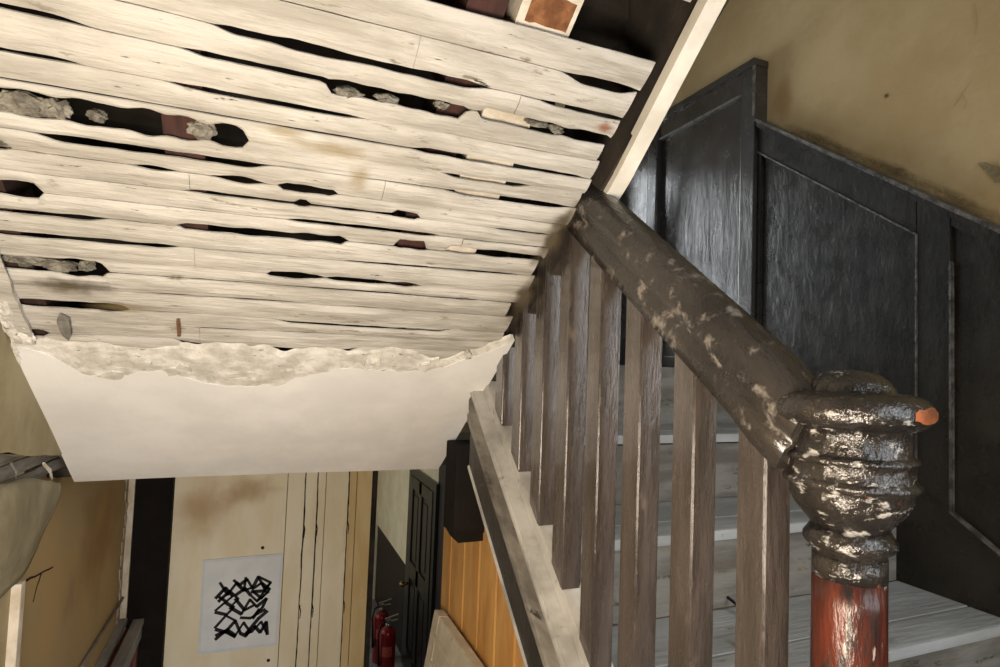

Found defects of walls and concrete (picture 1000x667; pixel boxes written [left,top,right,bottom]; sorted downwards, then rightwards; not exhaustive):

peeling [525,0,577,33]
spalling [0,300,511,386]